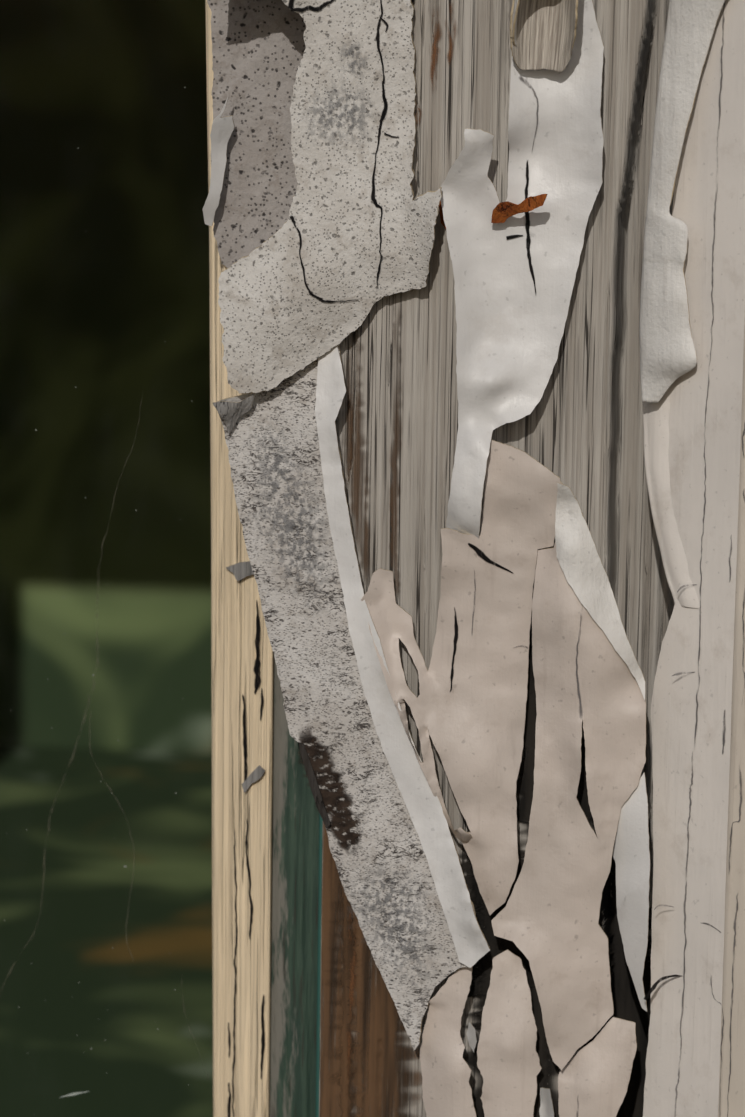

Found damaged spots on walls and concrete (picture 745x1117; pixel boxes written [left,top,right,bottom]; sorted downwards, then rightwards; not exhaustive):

crack [718,1,726,122]
crack [288,0,399,303]
crack [506,161,536,294]
peeling [202,0,650,1117]
crack [450,543,513,692]
crack [575,620,583,715]
crack [672,202,742,871]
crack [729,540,745,678]
crack [644,769,738,1117]